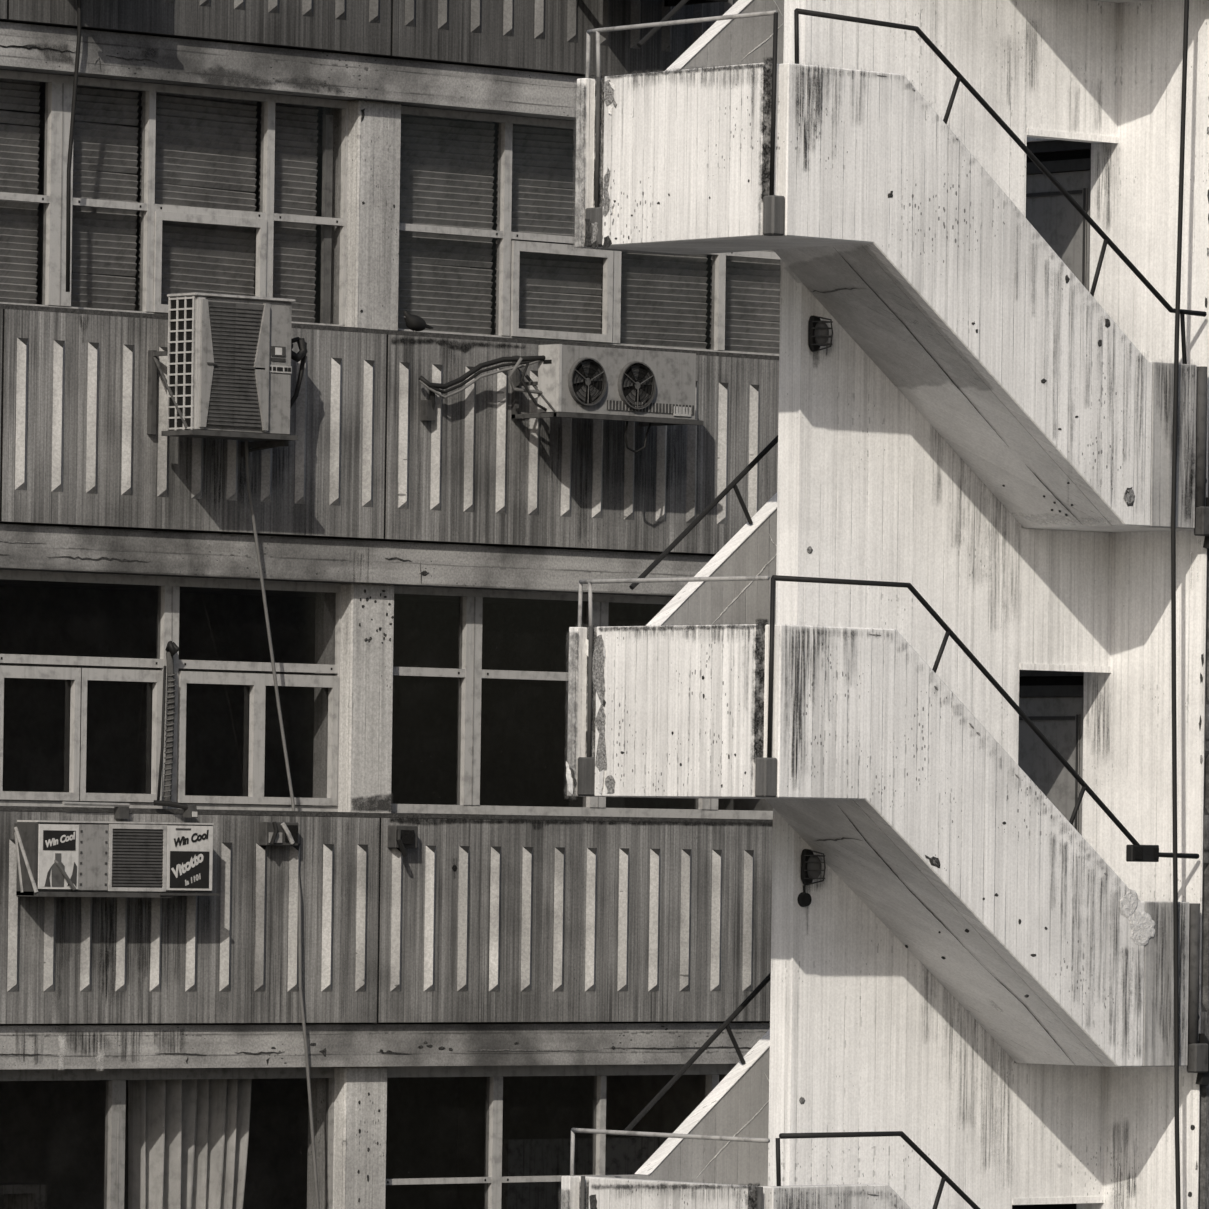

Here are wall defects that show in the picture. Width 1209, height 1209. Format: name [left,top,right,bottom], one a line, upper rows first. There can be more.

peeling [594,80,617,135]
damp [796,68,829,169]
peeling [584,168,629,249]
peeling [586,635,615,794]